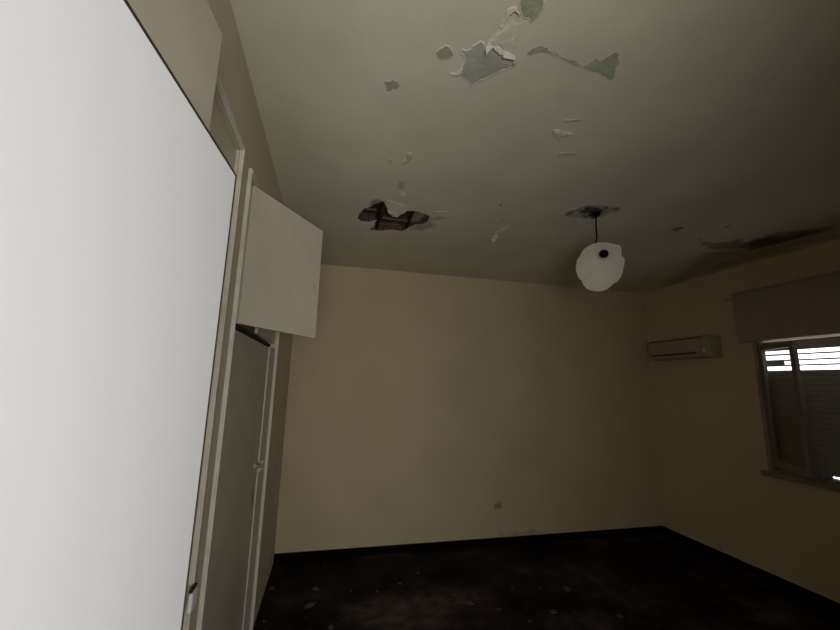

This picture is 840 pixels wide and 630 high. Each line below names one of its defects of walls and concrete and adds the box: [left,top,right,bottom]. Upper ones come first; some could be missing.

peeling [435,0,547,88]
peeling [581,51,621,81]
spalling [357,180,452,233]
damp [654,220,840,289]